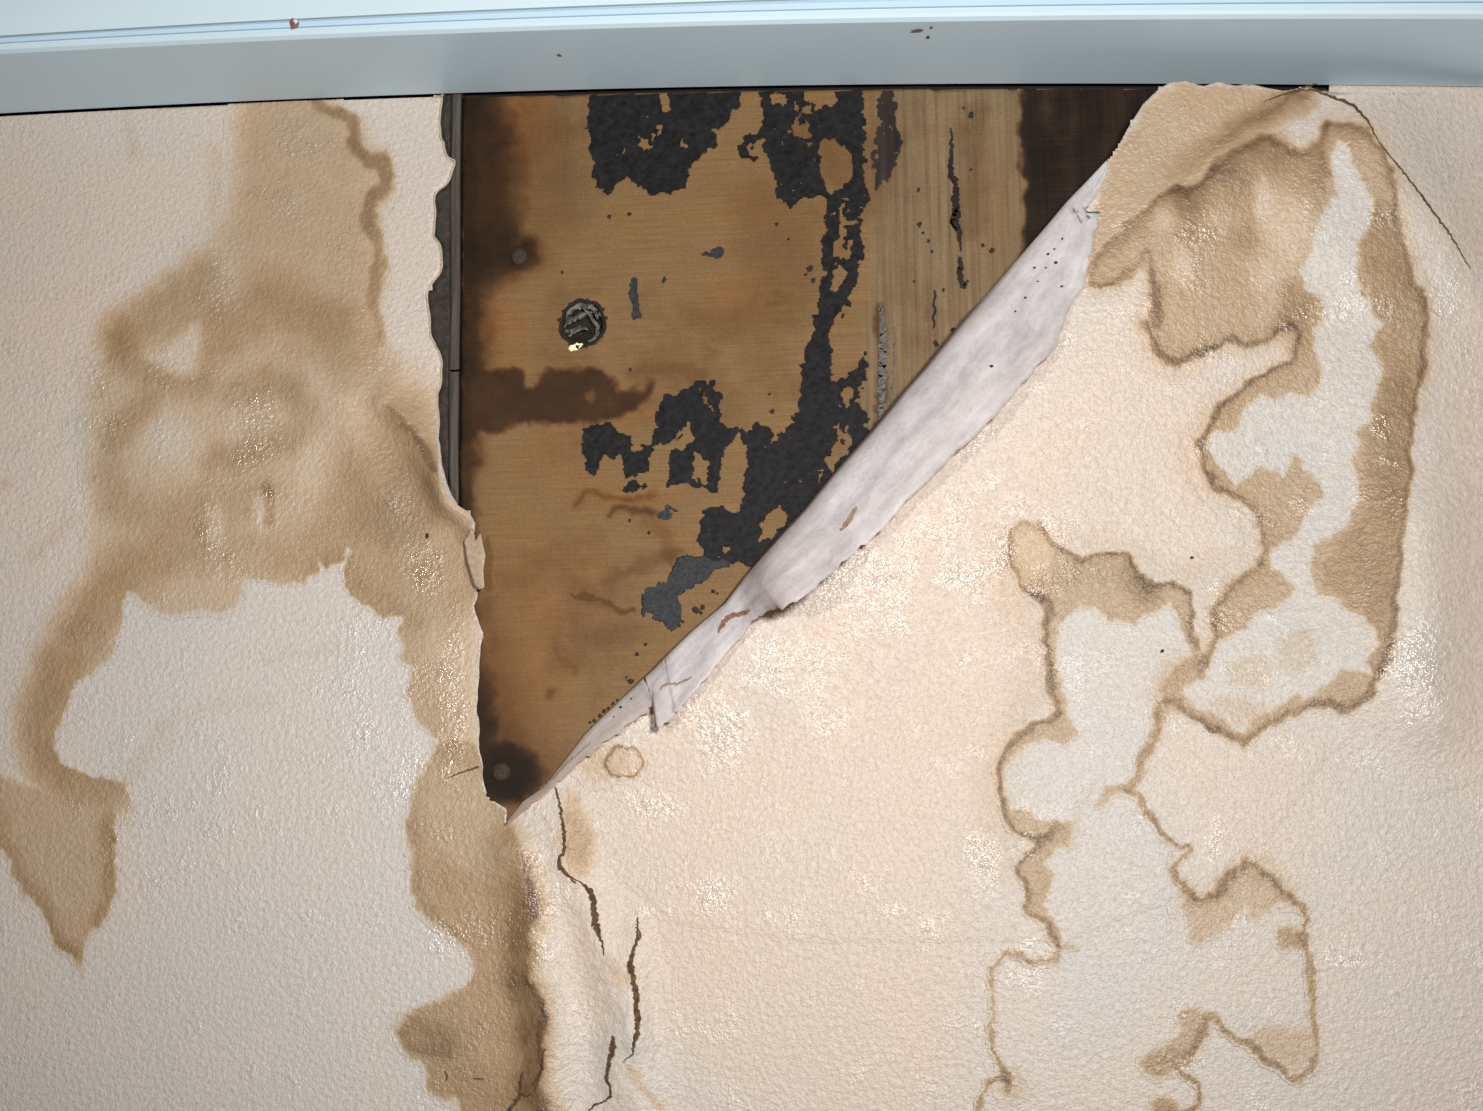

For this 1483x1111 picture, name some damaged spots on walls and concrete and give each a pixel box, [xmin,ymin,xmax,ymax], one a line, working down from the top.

peeling [564,303,603,342]
damp [669,265,816,351]
damp [0,99,659,1111]
peeling [642,556,730,630]
damp [677,589,727,627]
damp [972,82,1448,1111]
crack [555,787,641,1111]